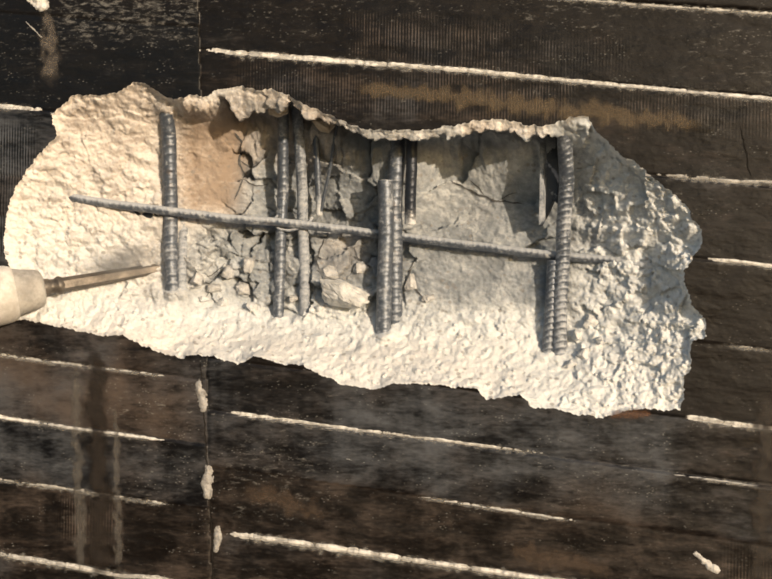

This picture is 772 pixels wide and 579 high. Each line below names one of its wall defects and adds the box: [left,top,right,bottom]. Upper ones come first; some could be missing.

spalling [3,82,707,418]
damp [0,353,168,579]